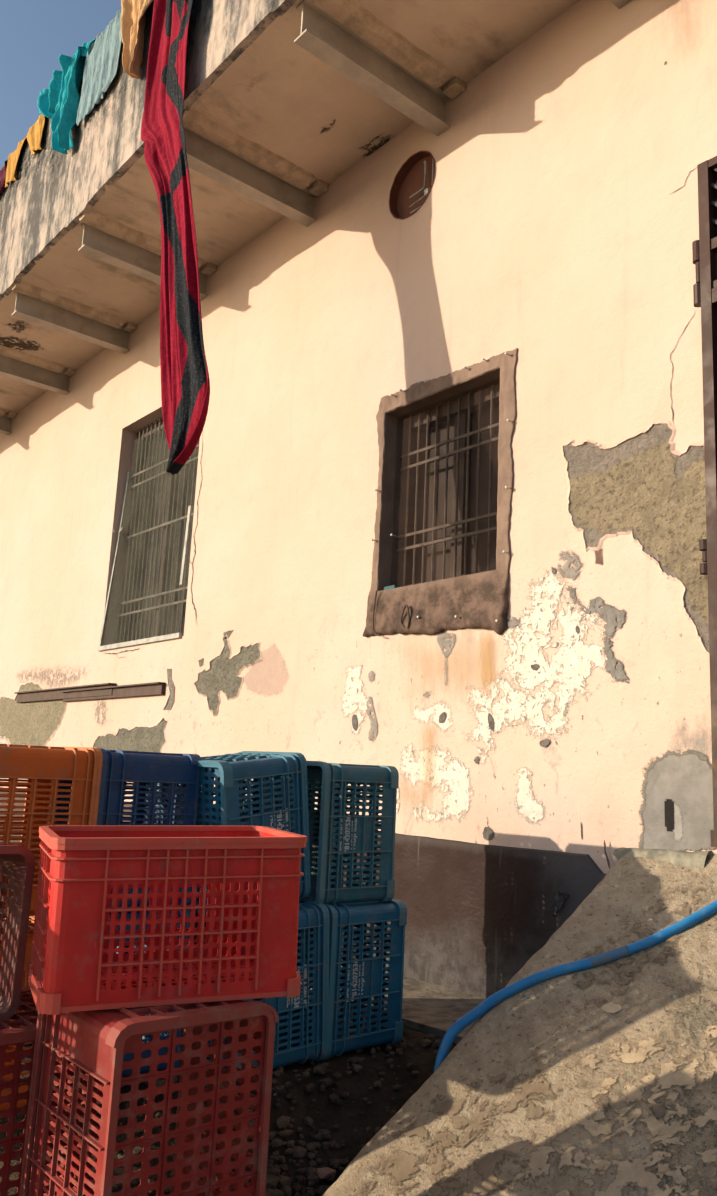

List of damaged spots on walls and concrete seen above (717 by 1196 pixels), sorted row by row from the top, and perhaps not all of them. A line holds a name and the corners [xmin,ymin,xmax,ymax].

water stain [0,134,60,215]
crack [670,312,695,425]
spalling [396,420,709,825]
spalling [0,681,67,746]
spalling [93,668,175,753]
spalling [194,630,263,717]